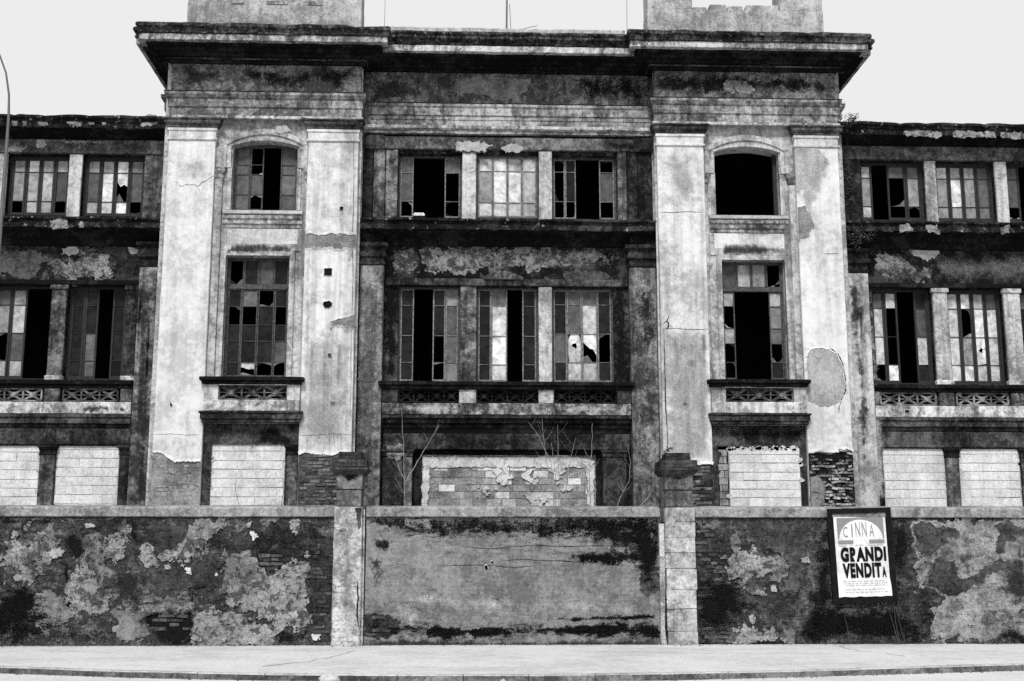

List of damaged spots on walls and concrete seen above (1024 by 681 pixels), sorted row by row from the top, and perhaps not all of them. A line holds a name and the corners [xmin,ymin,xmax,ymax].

peeling [904,130,1024,140]
flaking render [0,246,116,286]
flaking render [393,246,610,280]
flaking render [874,250,939,283]
flaking render [805,346,847,407]
peeling [521,466,573,506]
flaking render [808,446,856,507]
water stain [370,517,658,535]
flaking render [11,449,350,646]
water stain [578,555,623,566]
flaking render [758,518,813,593]
flaking render [900,518,1024,644]